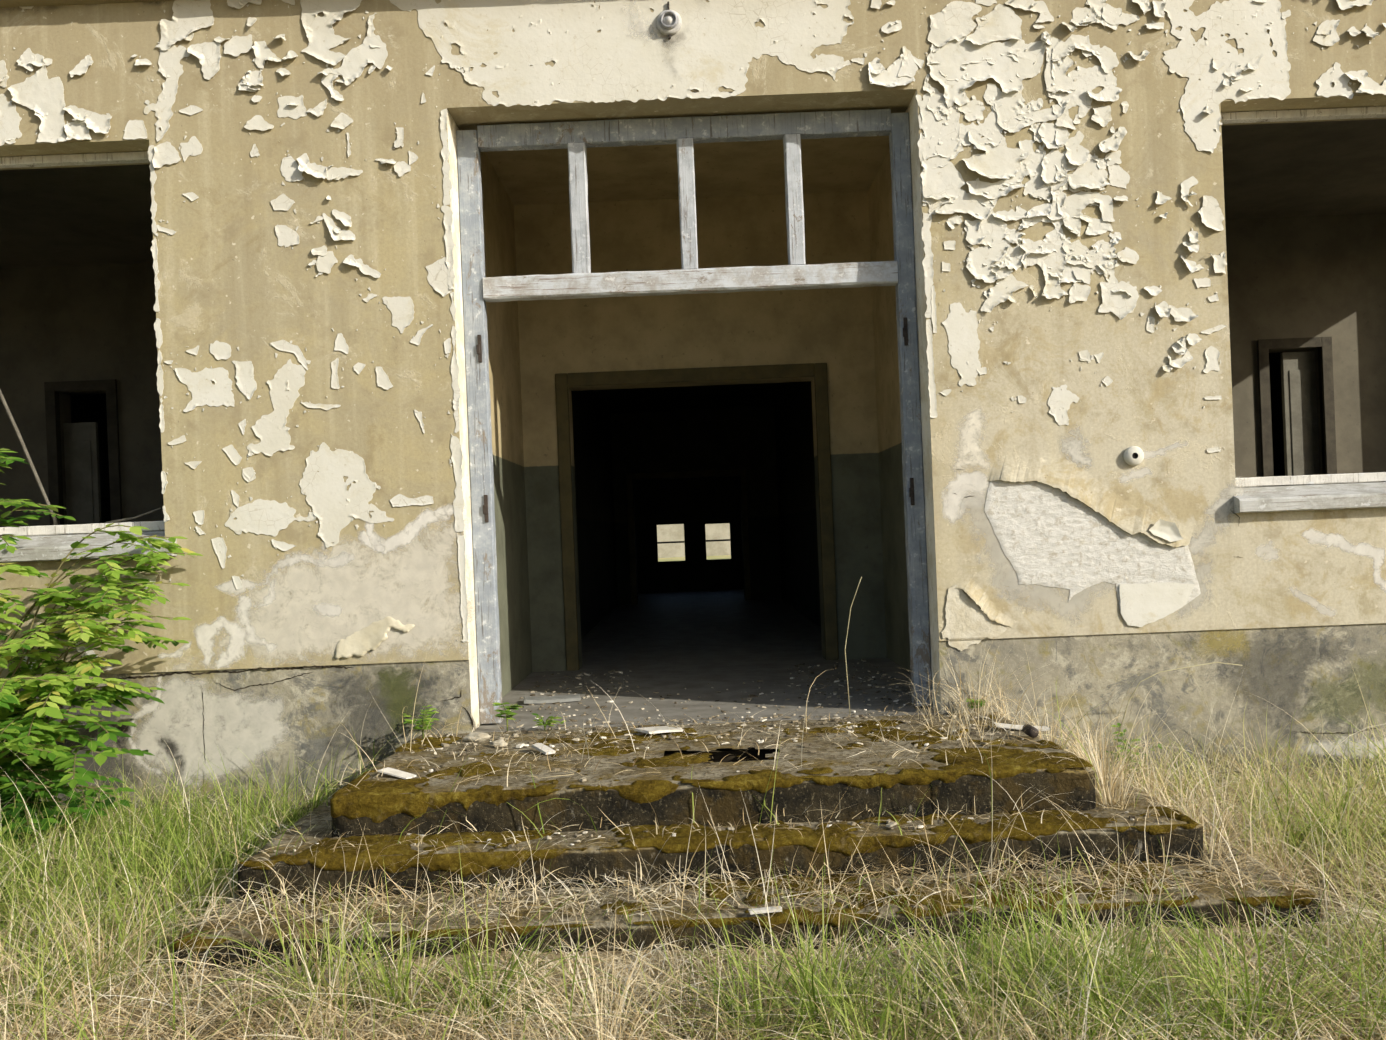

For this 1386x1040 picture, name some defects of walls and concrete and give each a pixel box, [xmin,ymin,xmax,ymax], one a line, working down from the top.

peeling [390,0,1386,418]
peeling [0,0,468,642]
peeling [1047,384,1079,426]
peeling [76,644,103,668]
damp [5,505,469,805]
flaking render [941,577,1014,651]
flaking render [984,452,1201,627]